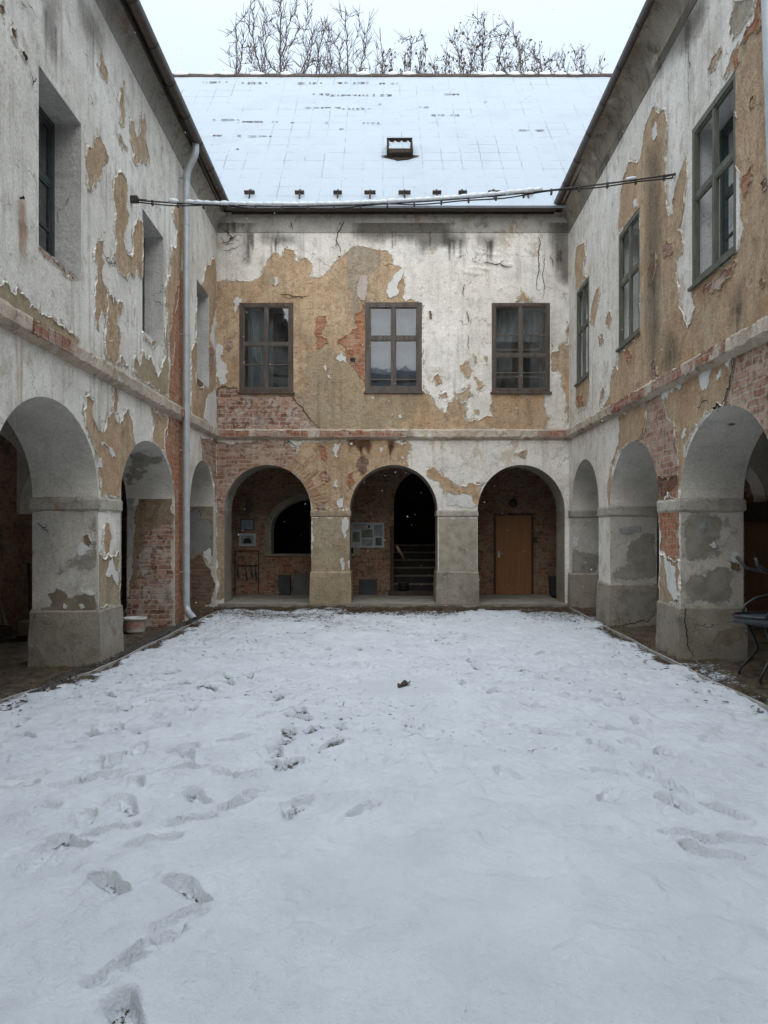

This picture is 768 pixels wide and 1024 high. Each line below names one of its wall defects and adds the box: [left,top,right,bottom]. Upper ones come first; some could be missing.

water stain [359,223,458,253]
water stain [555,223,568,279]
peeling [63,0,768,627]
water stain [681,513,732,604]
crack [684,608,694,657]